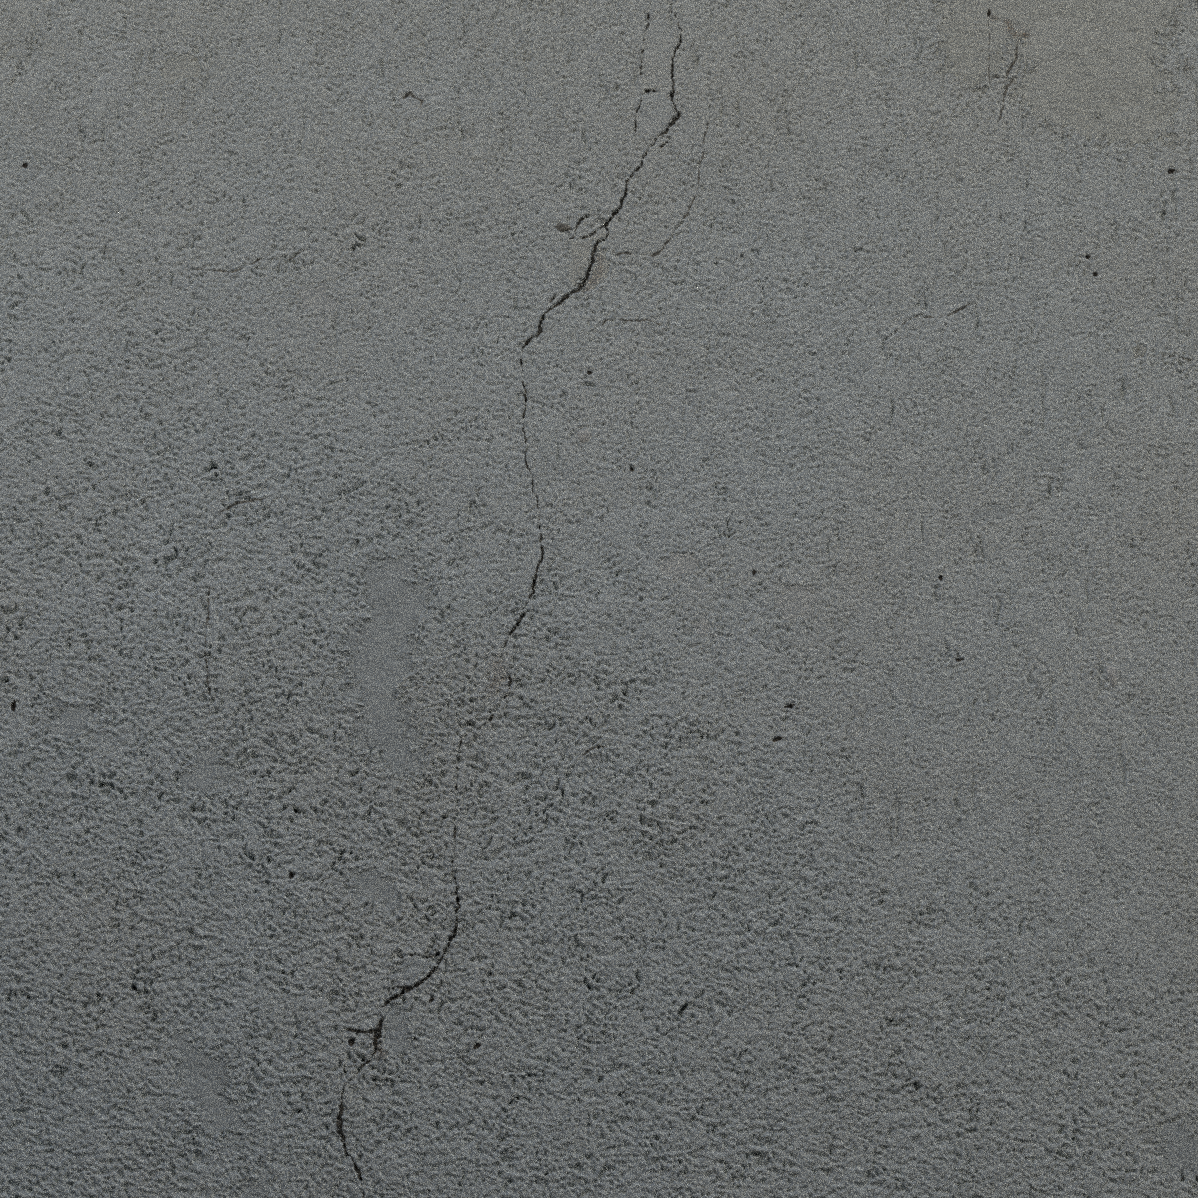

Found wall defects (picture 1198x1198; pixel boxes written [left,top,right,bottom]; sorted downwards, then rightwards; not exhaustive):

crack [403,92,423,108]
crack [455,0,708,790]
crack [336,819,461,1198]